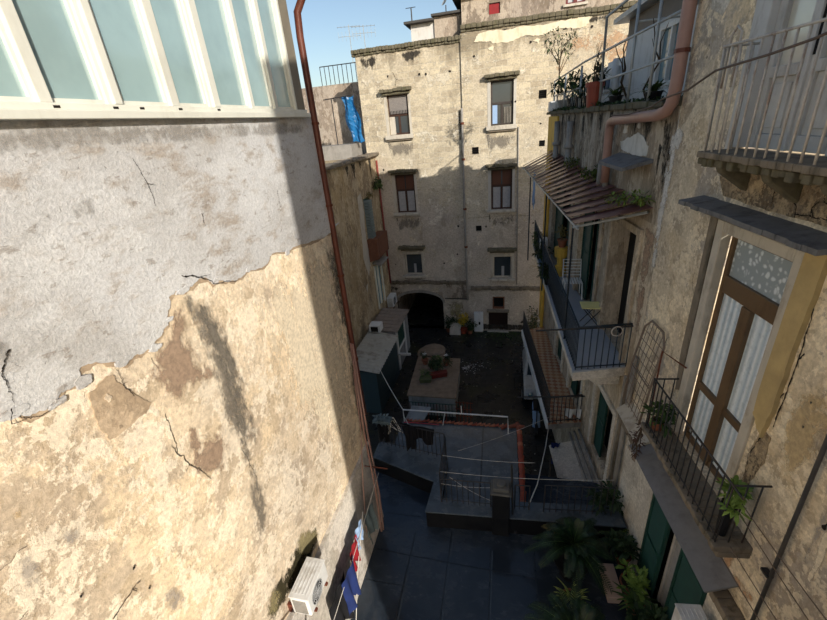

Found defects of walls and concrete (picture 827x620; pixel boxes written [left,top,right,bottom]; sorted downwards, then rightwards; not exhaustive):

peeling [474,16,593,51]
peeling [620,123,649,156]
peeling [357,193,371,274]
peeling [0,117,338,440]
crack [1,349,51,424]
crack [165,414,212,479]
water stain [152,299,265,533]
mould [268,530,318,618]